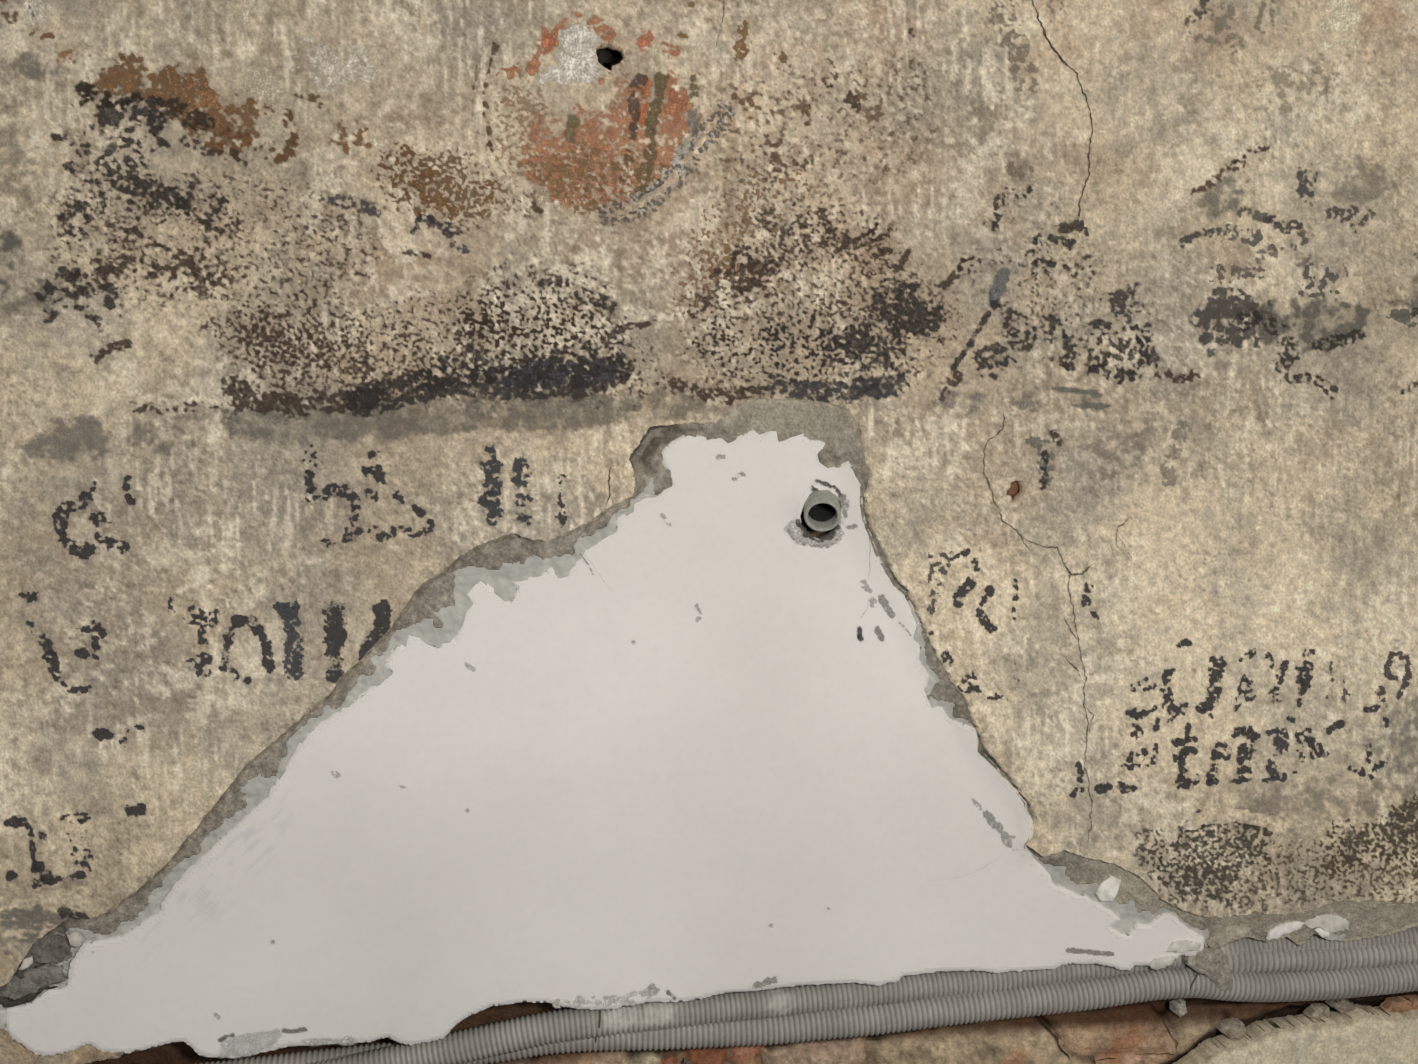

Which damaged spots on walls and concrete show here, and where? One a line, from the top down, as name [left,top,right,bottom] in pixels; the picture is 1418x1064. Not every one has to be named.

rust [29,29,323,167]
rust [330,120,535,234]
damp [34,96,1201,421]
rust [733,20,752,61]
rust [662,52,936,315]
damp [990,0,1038,93]
crack [1032,0,1093,221]
damp [1179,145,1418,400]
damp [1026,430,1065,490]
flaking render [0,398,1418,1064]
crack [983,416,1132,840]
damp [1134,786,1418,913]